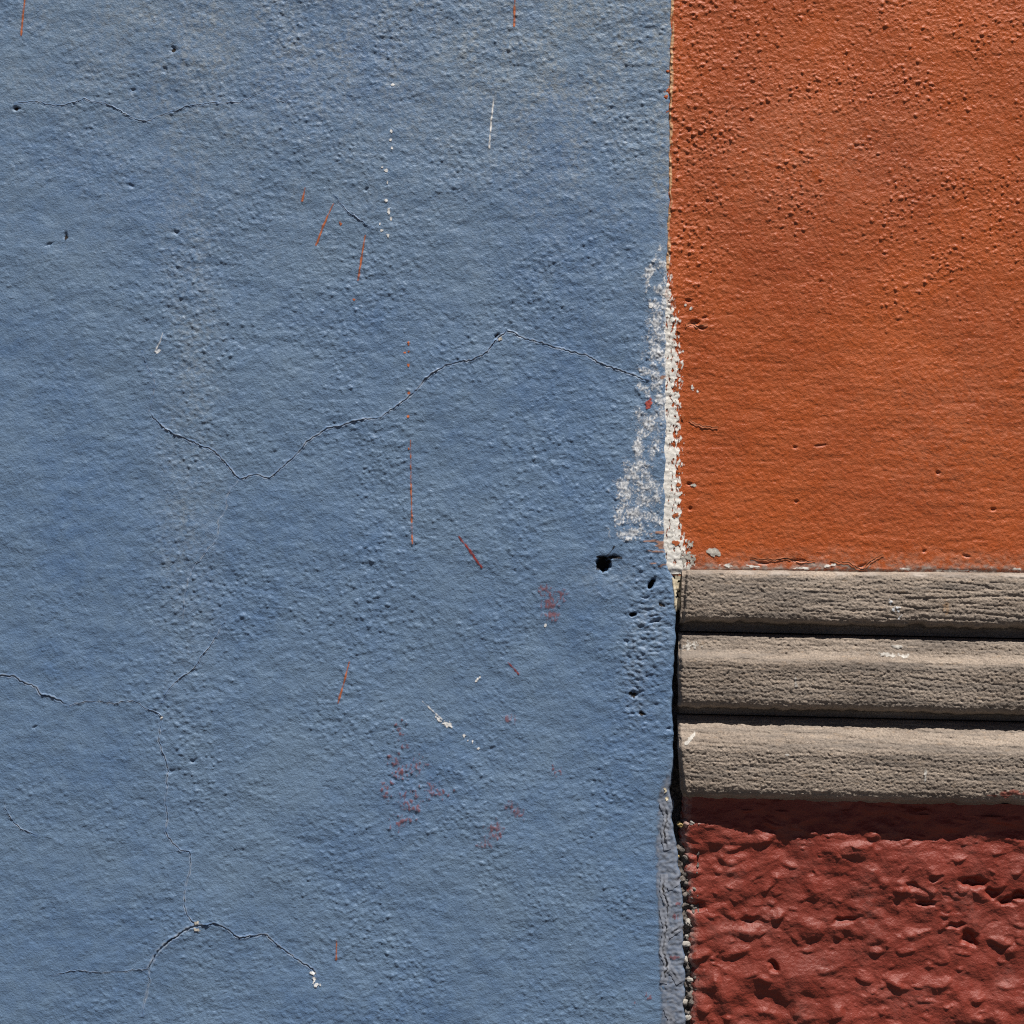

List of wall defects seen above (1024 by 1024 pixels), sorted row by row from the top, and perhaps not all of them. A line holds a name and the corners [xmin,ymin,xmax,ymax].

crack [14,92,297,123]
crack [141,329,651,625]
hole [596,546,622,572]
crack [0,617,321,1017]